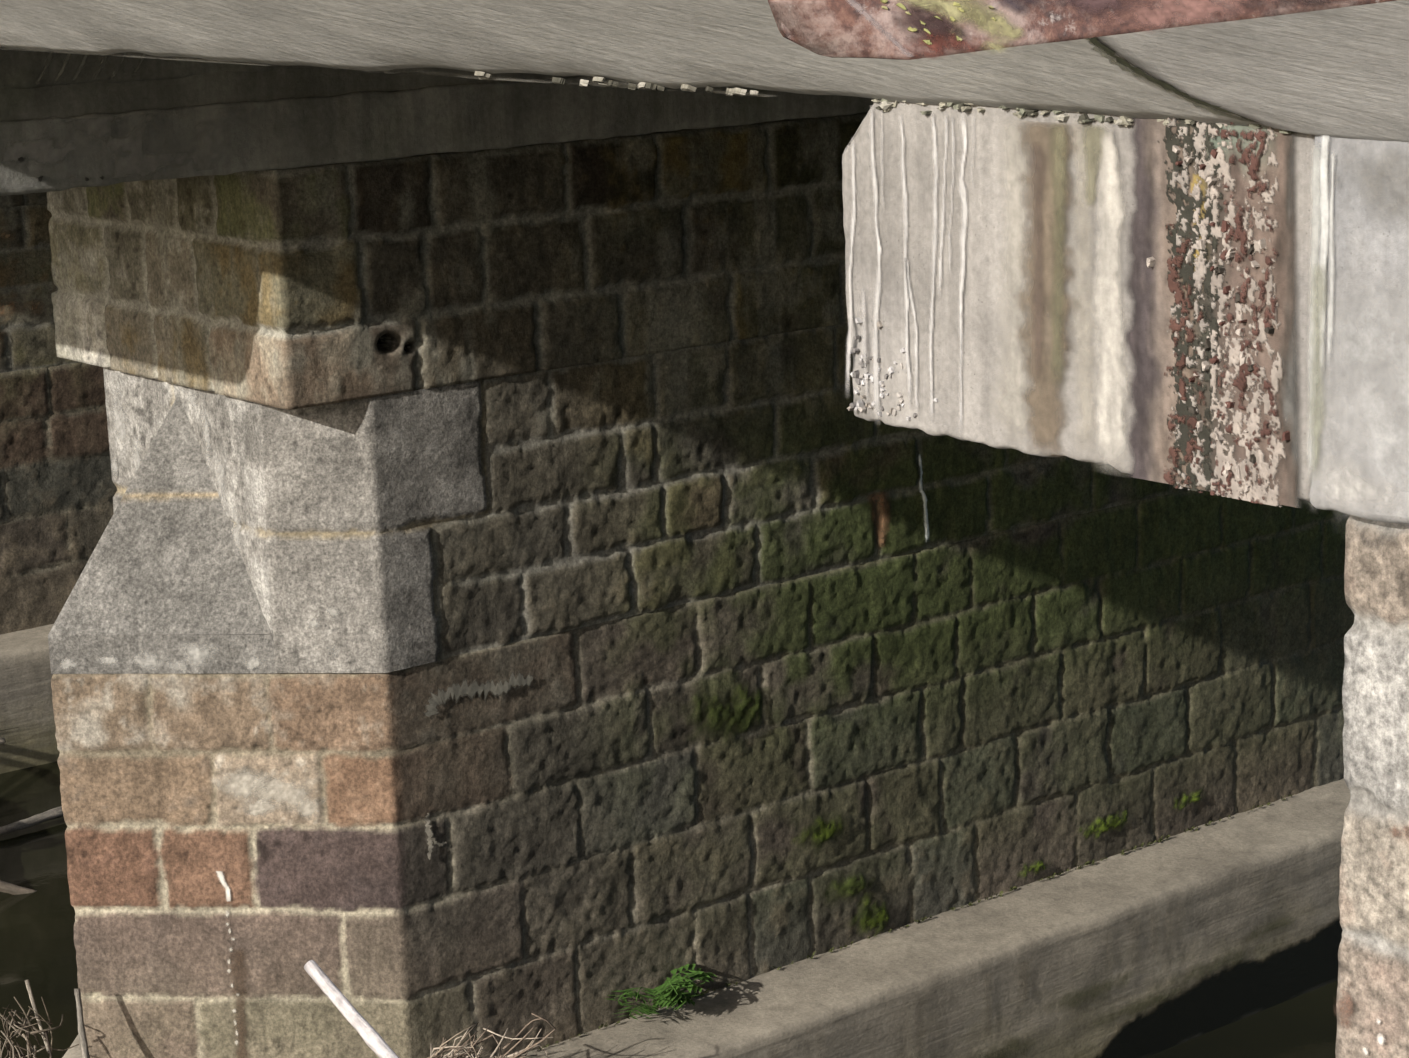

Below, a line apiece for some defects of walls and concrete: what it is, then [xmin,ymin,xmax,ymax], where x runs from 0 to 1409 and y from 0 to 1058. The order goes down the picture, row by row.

leakage [847,112,881,407]
leakage [900,117,968,419]
spalling [871,99,1135,127]
leakage [999,123,1126,459]
spalling [1157,119,1223,128]
corrosion [1125,117,1298,508]
leakage [1094,917,1343,1058]